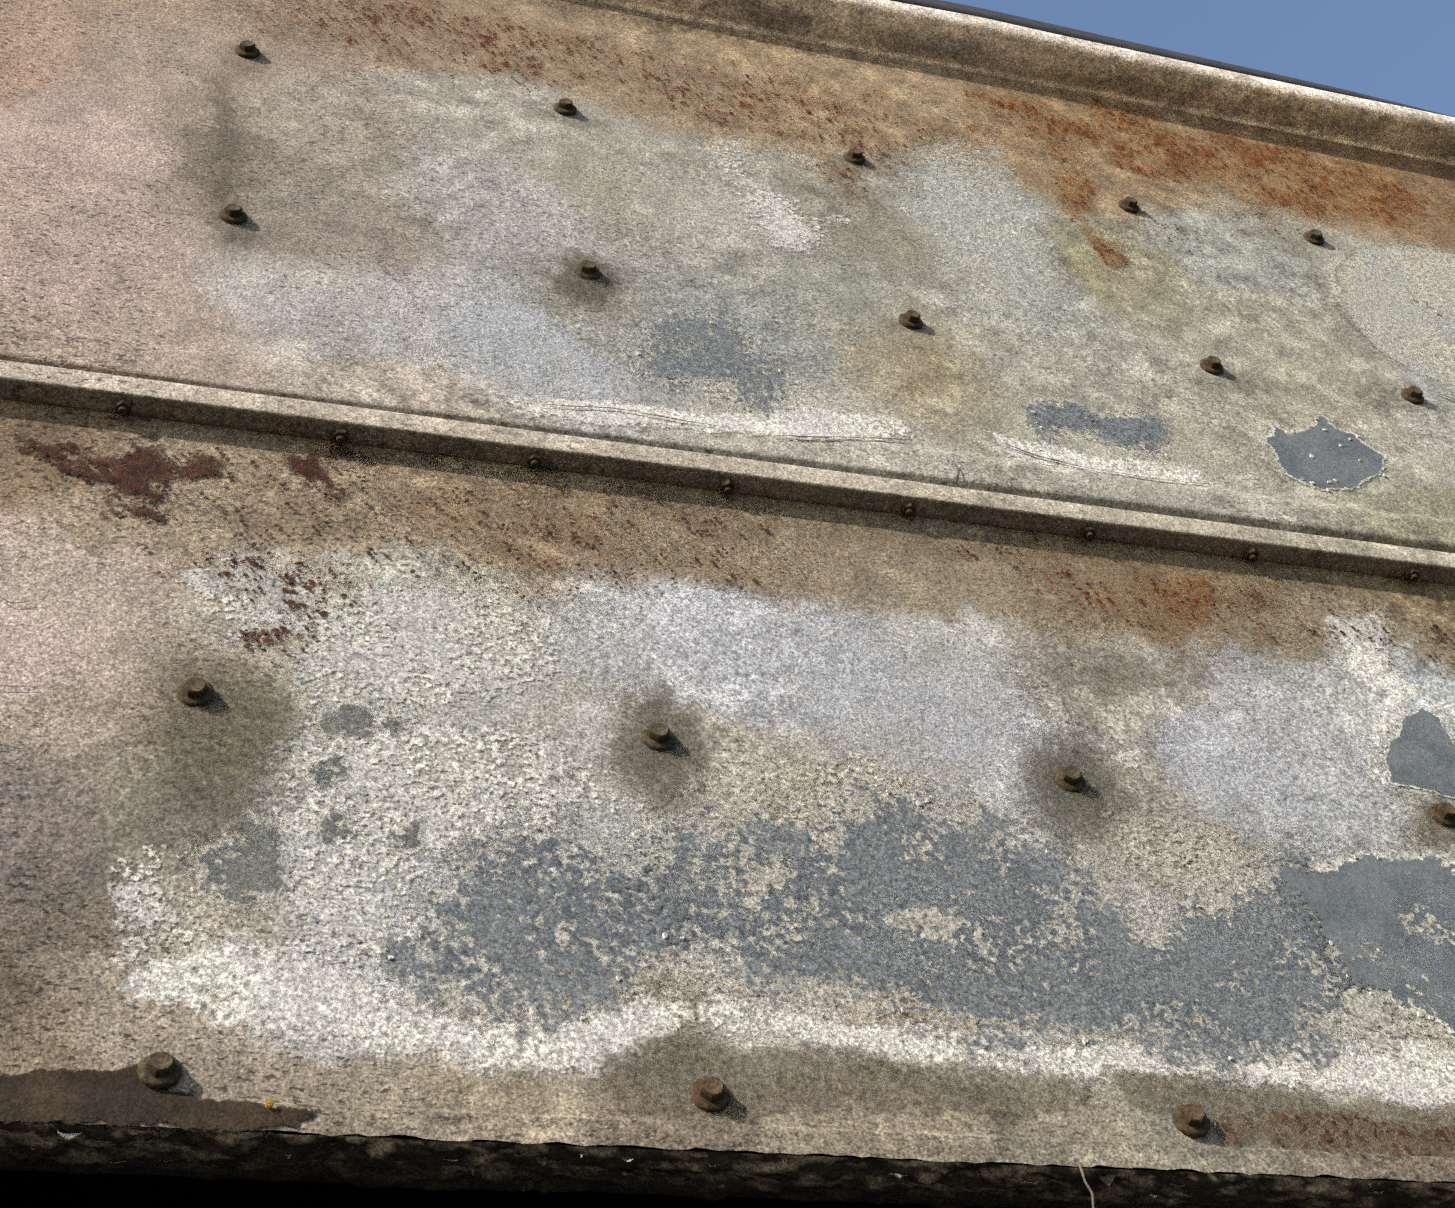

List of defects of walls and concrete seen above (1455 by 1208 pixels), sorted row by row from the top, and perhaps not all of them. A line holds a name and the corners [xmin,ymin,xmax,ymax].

rust [246,0,1454,268]
peeling [1020,397,1172,456]
peeling [1265,415,1387,492]
rust [13,431,803,652]
peeling [309,755,348,790]
peeling [319,704,408,738]
peeling [1384,707,1455,798]
peeling [320,810,353,842]
water stain [108,553,1455,1133]
peeling [378,767,1455,1085]
water stain [0,1064,315,1132]
peeling [31,1127,241,1164]